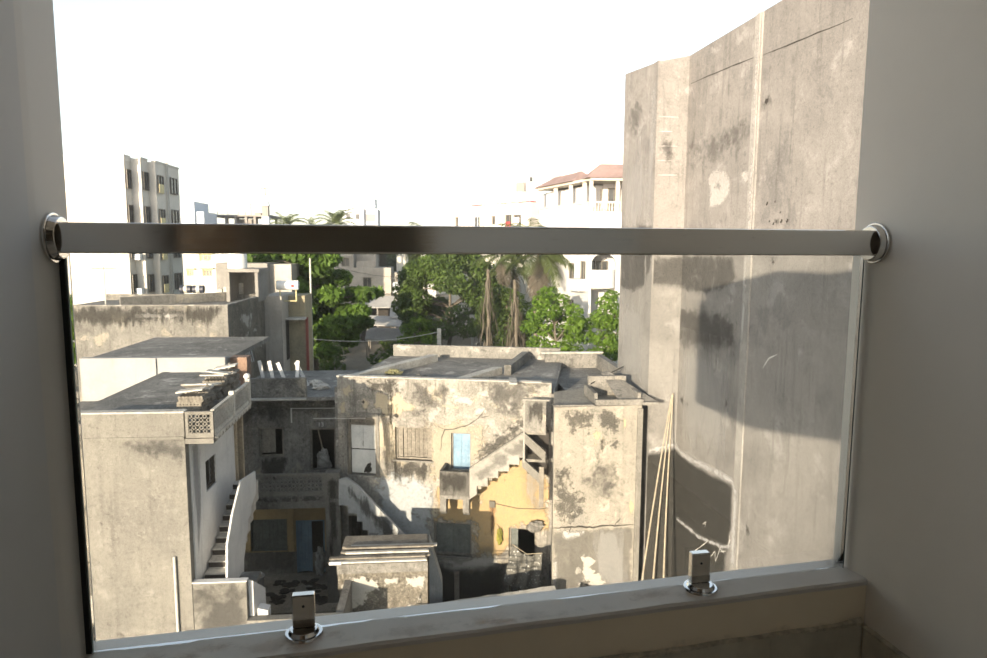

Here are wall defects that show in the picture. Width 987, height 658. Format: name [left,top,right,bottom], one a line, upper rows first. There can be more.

damp [621,255,734,291]
damp [420,388,447,406]
damp [368,379,427,481]
damp [565,409,618,451]
damp [551,467,585,576]
flaking render [575,554,606,586]
flaking render [341,576,426,608]